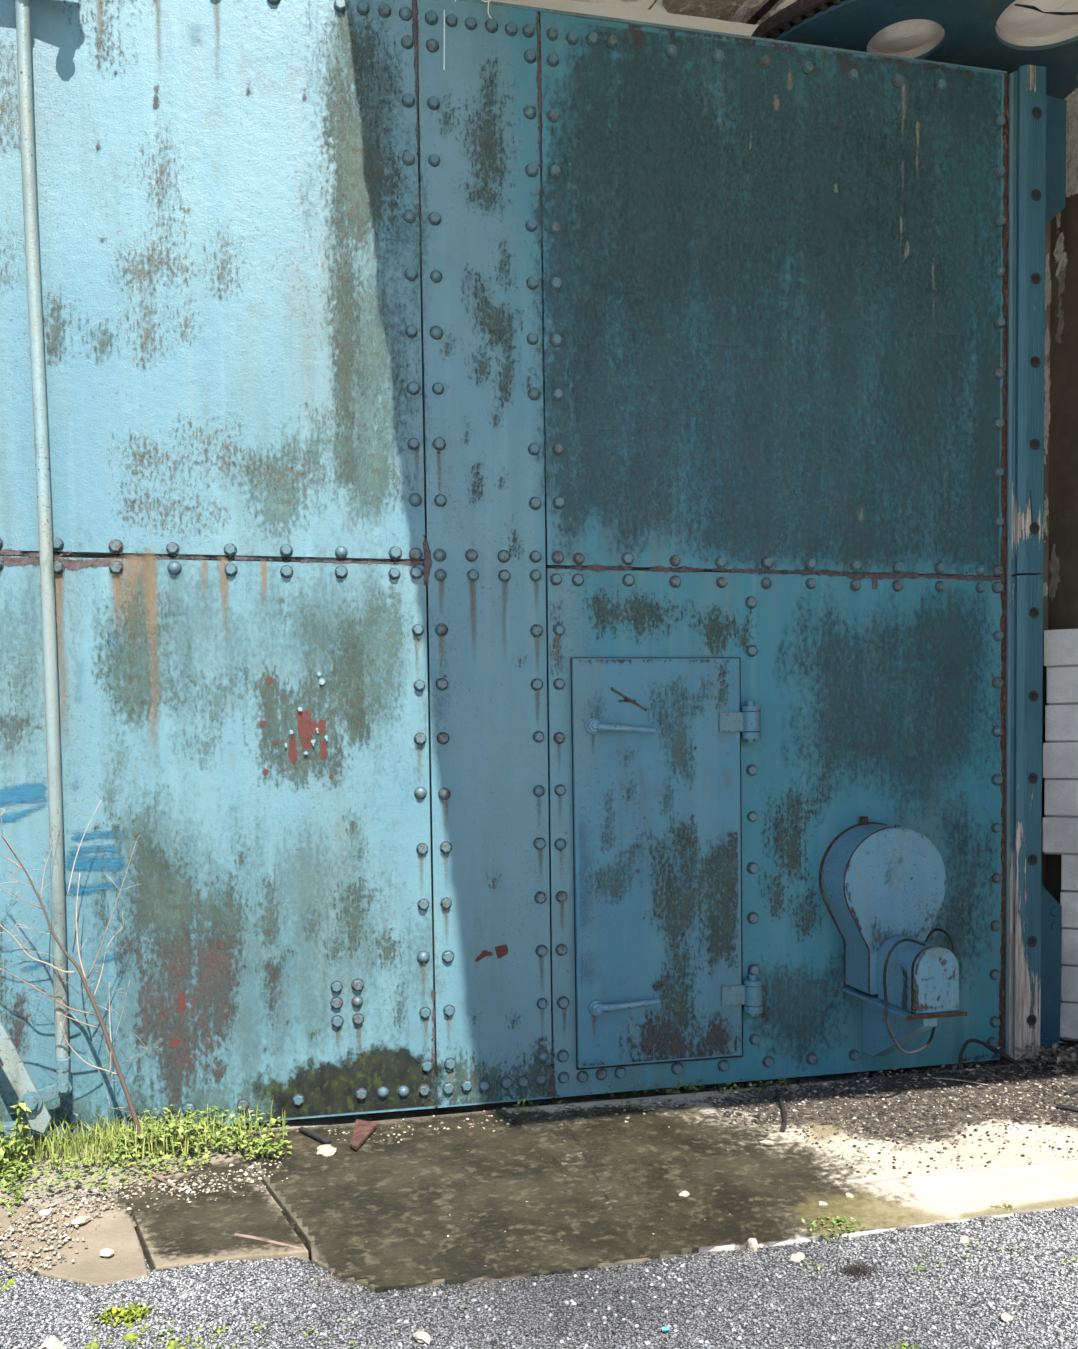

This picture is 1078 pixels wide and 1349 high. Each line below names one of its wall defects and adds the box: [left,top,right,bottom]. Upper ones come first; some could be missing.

spalling [629,0,971,81]
crack [1015,4,1078,15]
rust [54,573,62,637]
rust [113,556,156,625]
rust [114,922,245,1114]
rust [265,962,288,1026]
rust [619,1011,741,1062]
leakage [0,1095,18,1122]
leakage [45,1038,912,1288]